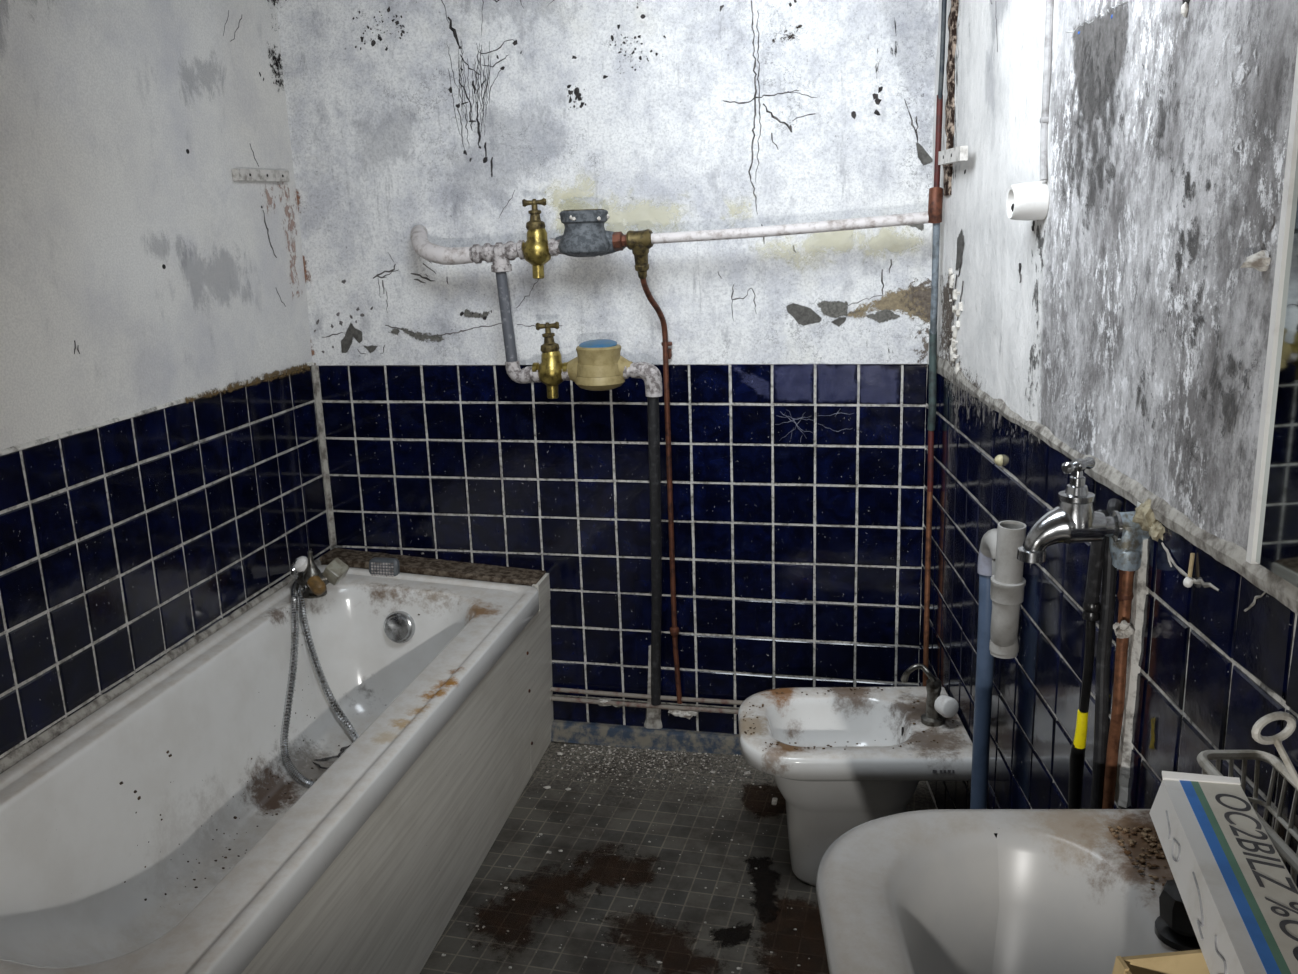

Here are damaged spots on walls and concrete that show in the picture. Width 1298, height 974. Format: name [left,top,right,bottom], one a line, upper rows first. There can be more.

crack [723,0,817,242]
damp [1061,17,1137,243]
damp [1142,62,1266,455]
spalling [314,306,444,354]
spalling [786,300,848,327]
spalling [867,309,900,323]
crack [775,408,853,443]
damp [1134,362,1206,514]
damp [709,856,780,948]